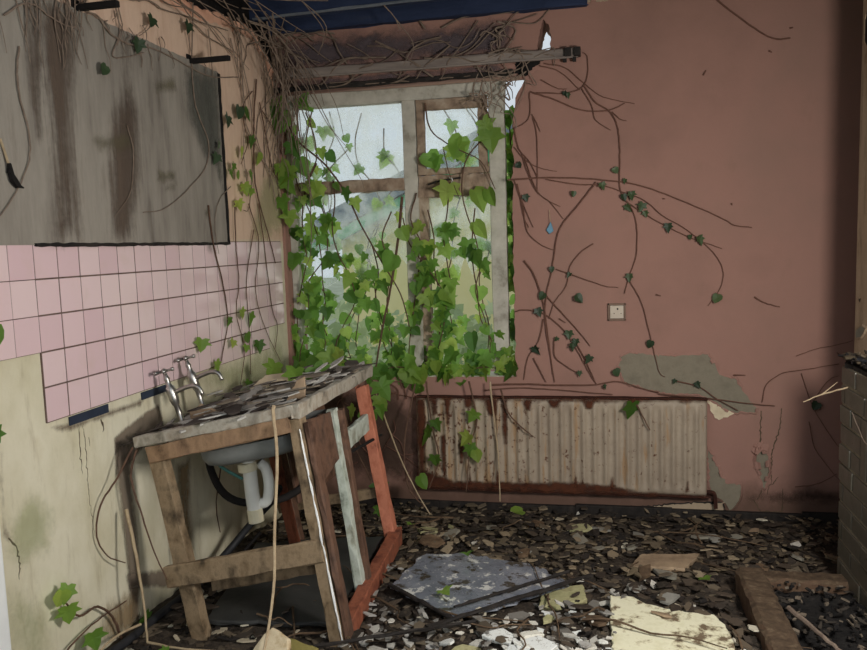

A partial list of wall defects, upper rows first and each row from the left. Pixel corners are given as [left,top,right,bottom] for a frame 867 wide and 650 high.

spalling [616,350,760,421]